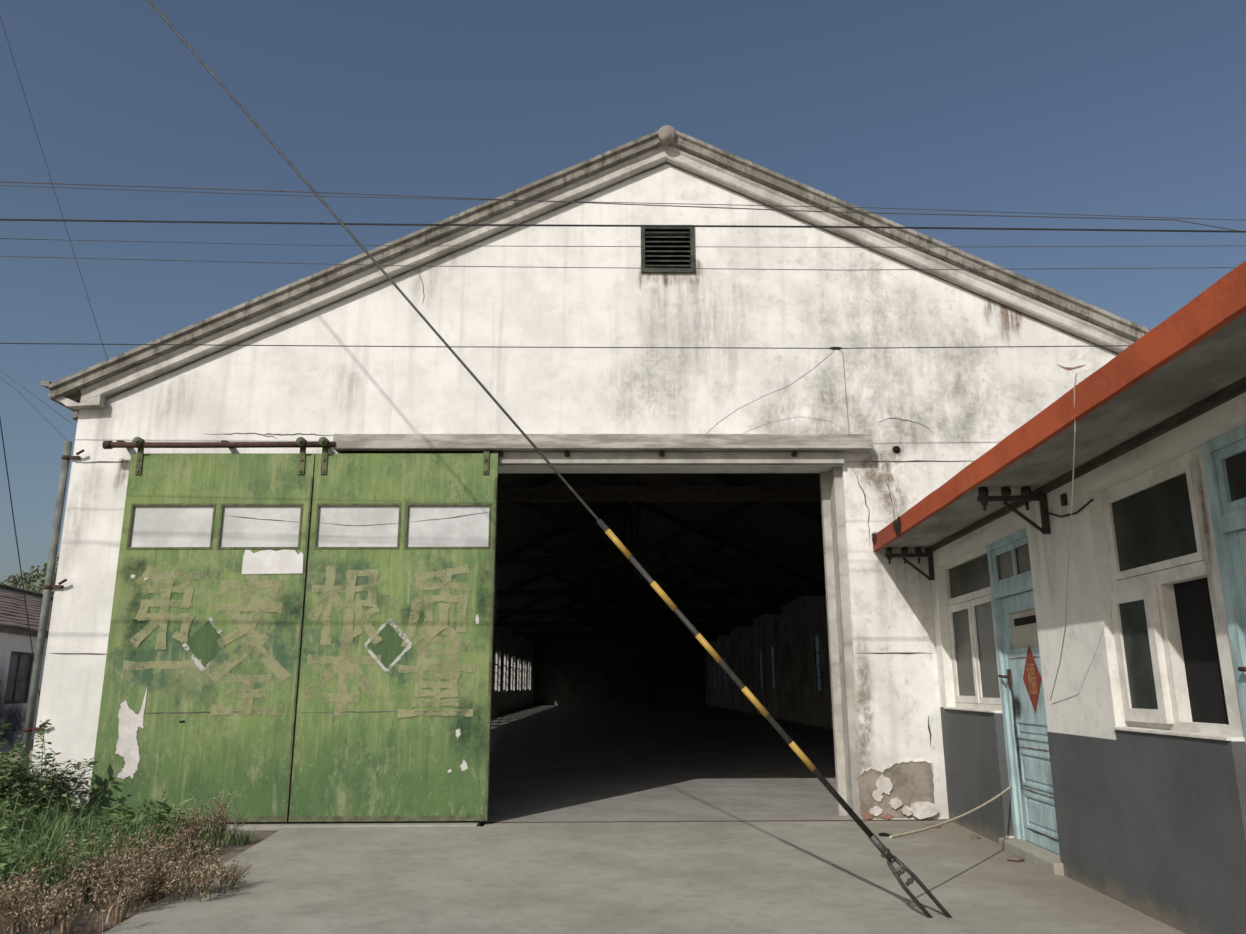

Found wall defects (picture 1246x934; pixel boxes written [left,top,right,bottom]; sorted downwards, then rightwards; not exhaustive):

crack [204,432,331,440]
crack [851,468,896,540]
spalling [858,759,939,820]